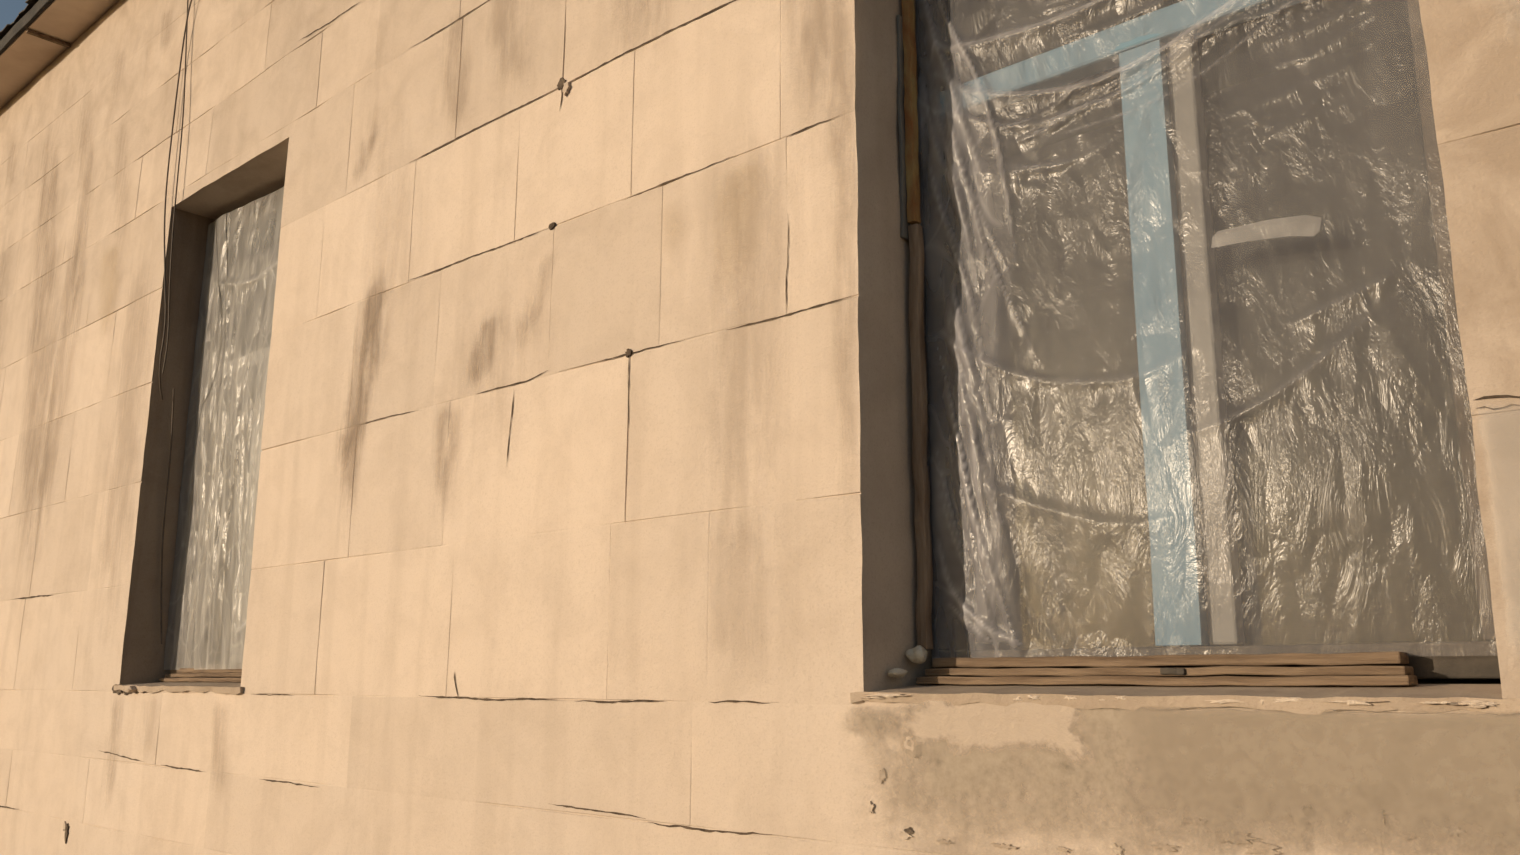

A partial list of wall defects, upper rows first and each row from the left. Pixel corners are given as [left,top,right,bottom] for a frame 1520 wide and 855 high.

crack [478,370,548,457]
peeling [862,693,1092,761]
spalling [1260,697,1386,705]
spalling [1419,700,1498,708]